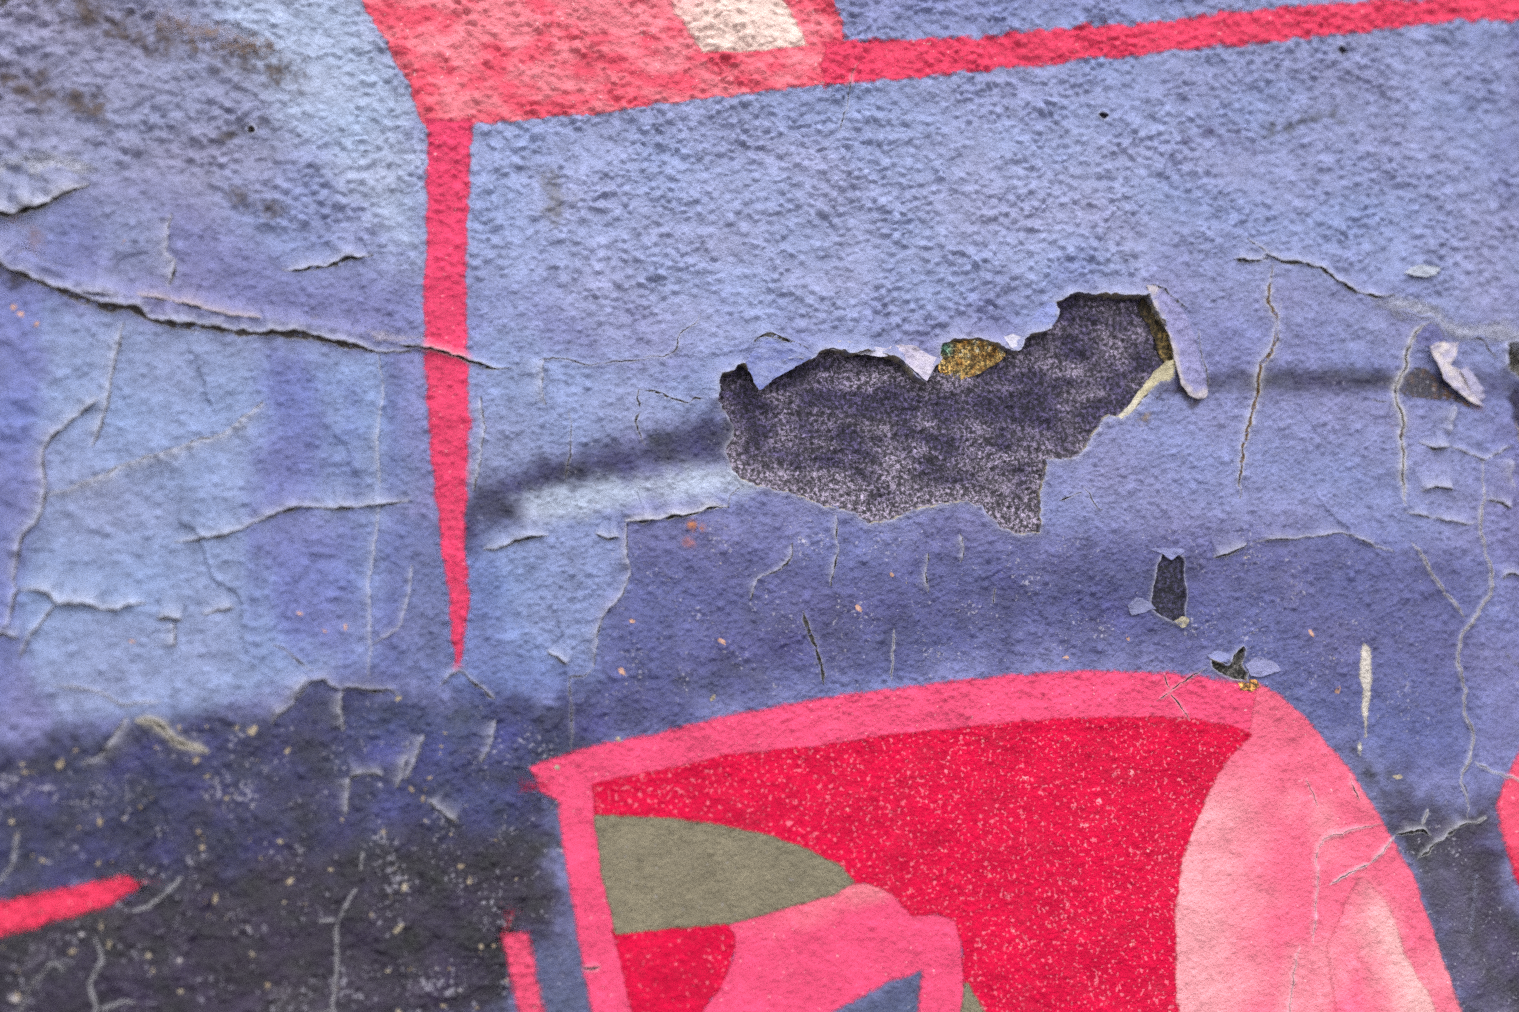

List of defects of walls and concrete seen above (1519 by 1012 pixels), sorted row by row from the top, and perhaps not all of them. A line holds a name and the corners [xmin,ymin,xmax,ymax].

peeling [1396,323,1485,409]
peeling [1508,343,1519,376]
peeling [700,277,1208,545]
crack [0,160,706,823]
peeling [1127,548,1190,629]
crack [1151,236,1519,1012]
crack [0,830,20,886]
crack [15,936,135,1012]
crack [131,875,184,913]
crack [318,852,365,1012]
crack [582,961,601,975]